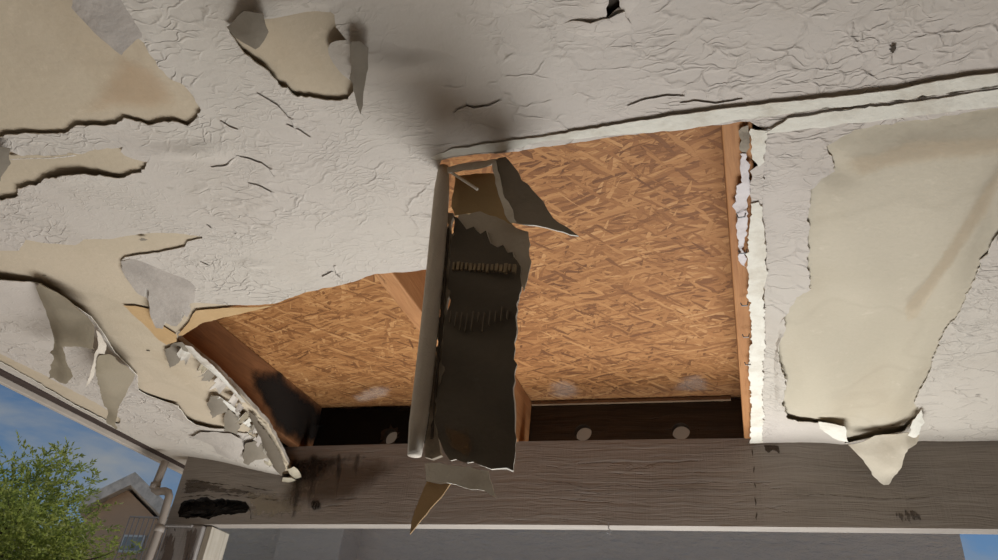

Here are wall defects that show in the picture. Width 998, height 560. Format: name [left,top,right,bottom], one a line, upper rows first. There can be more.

peeling [0,0,201,200]
peeling [227,11,369,114]
peeling [563,0,641,37]
peeling [732,108,998,485]
peeling [0,233,301,483]
damp [254,372,410,446]
damp [286,458,384,510]